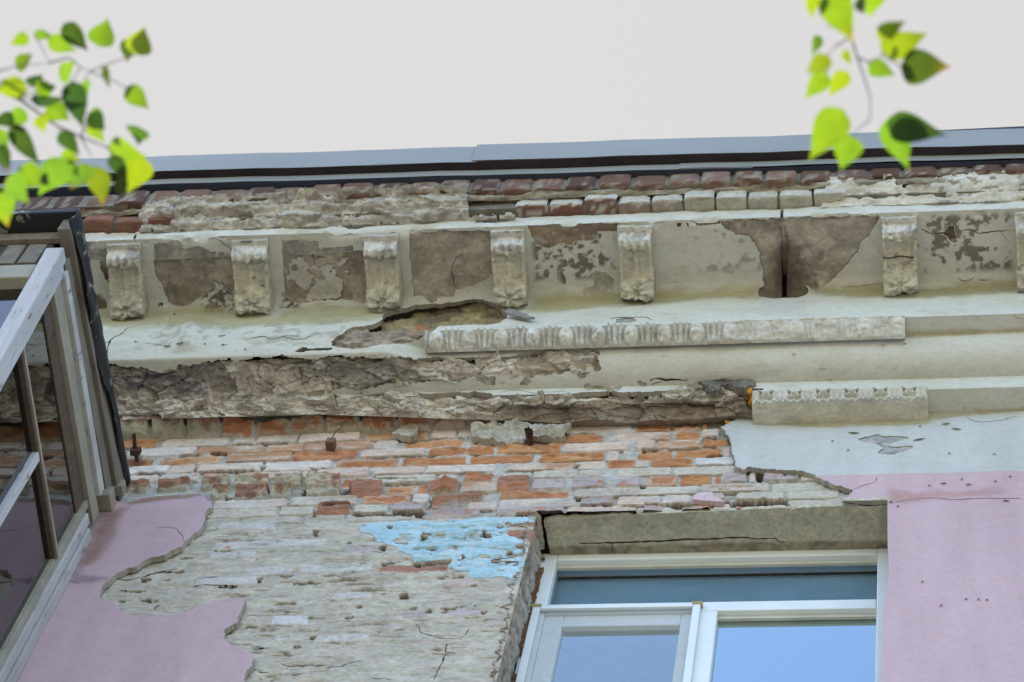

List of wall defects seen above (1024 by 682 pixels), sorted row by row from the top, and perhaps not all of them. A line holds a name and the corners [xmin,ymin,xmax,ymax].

flaking render [529,223,618,247]
flaking render [677,170,1024,299]
crack [921,229,1011,243]
flaking render [282,240,367,304]
flaking render [557,259,568,284]
flaking render [333,230,535,349]
flaking render [471,373,496,385]
flaking render [577,370,648,399]
flaking render [699,378,756,397]
flaking render [851,425,922,455]
flaking render [101,410,849,682]
crack [579,537,786,551]